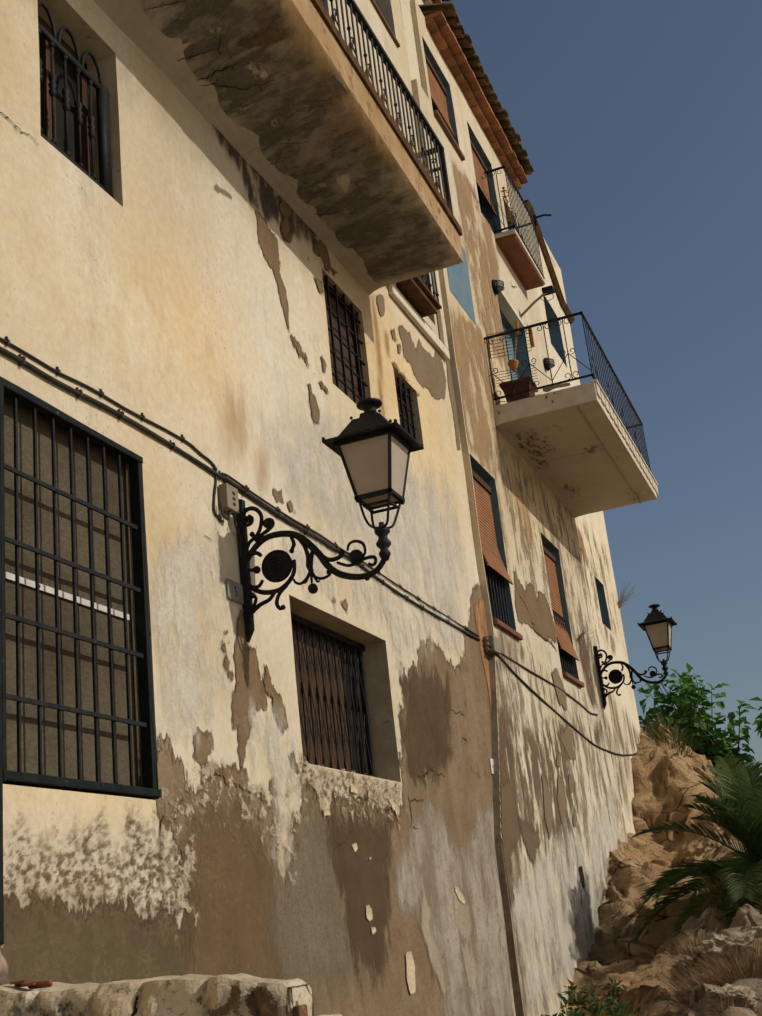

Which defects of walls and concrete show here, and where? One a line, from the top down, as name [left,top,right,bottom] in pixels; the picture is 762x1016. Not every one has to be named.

leakage [162,0,449,281]
flaking render [254,201,329,425]
flaking render [308,239,337,296]
flaking render [377,294,385,316]
flaking render [391,163,509,472]
flaking render [530,383,570,403]
flaking render [514,571,557,643]
flaking render [4,584,580,1016]
leakage [3,424,629,1016]
crack [131,996,139,1016]